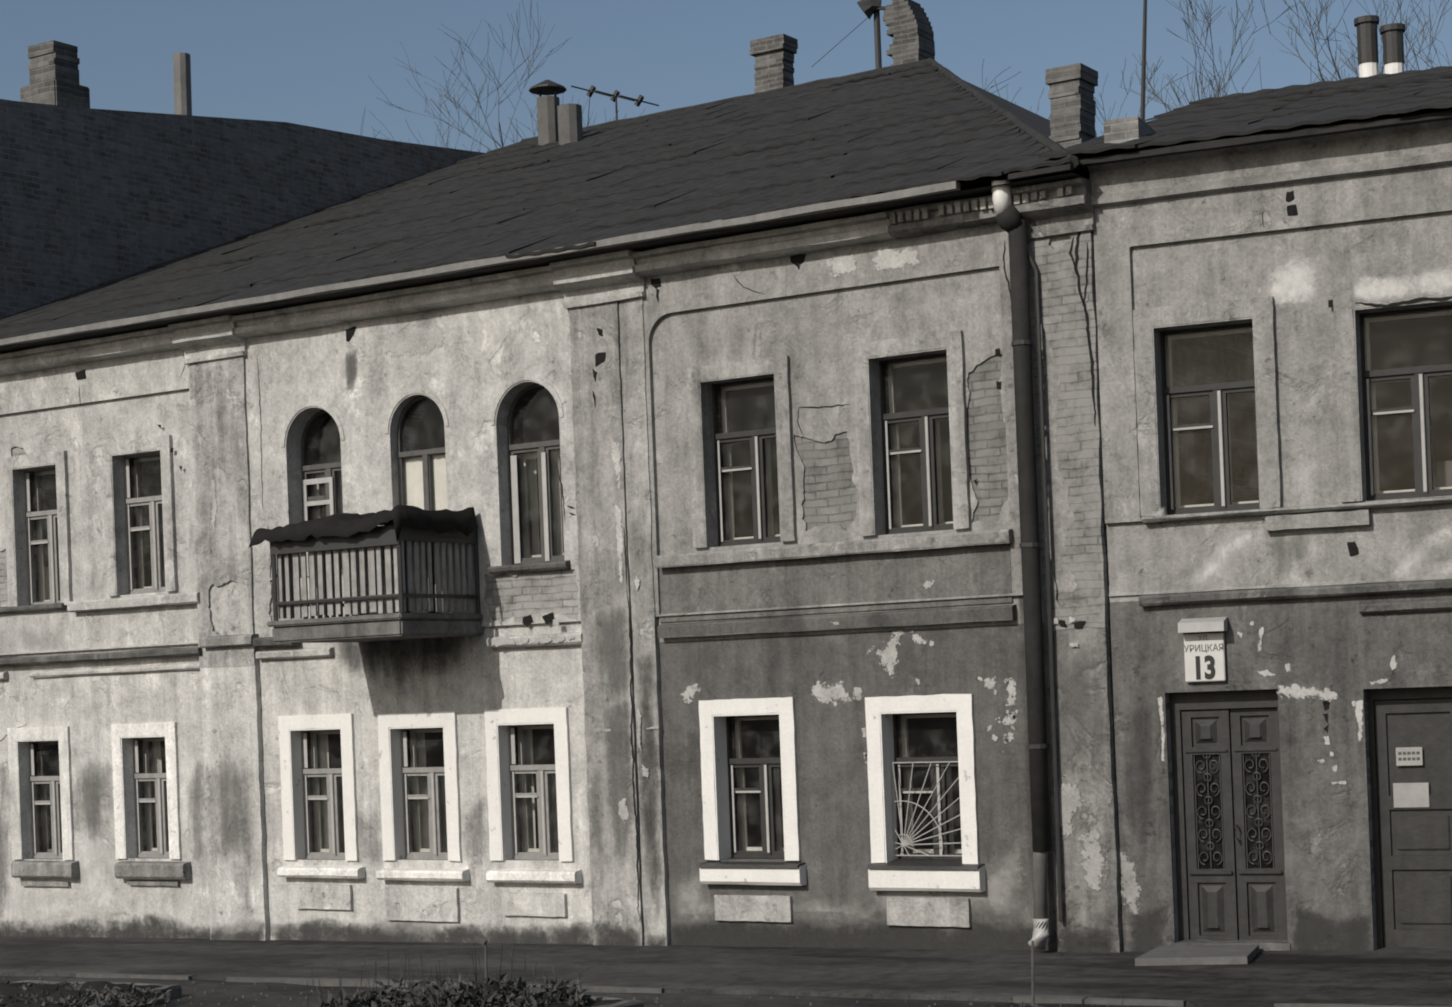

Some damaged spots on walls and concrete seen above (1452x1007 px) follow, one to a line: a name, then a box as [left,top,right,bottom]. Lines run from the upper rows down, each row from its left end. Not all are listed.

crack [1069,232,1109,592]
spalling [795,432,857,531]
damp [342,637,459,677]
peeling [811,680,862,707]
peeling [867,629,934,679]
peeling [978,676,1018,752]
peeling [1257,655,1397,785]
damp [610,662,658,884]
peeling [1053,782,1143,914]
damp [0,864,1113,953]
damp [1133,910,1162,951]
damp [1294,911,1369,950]